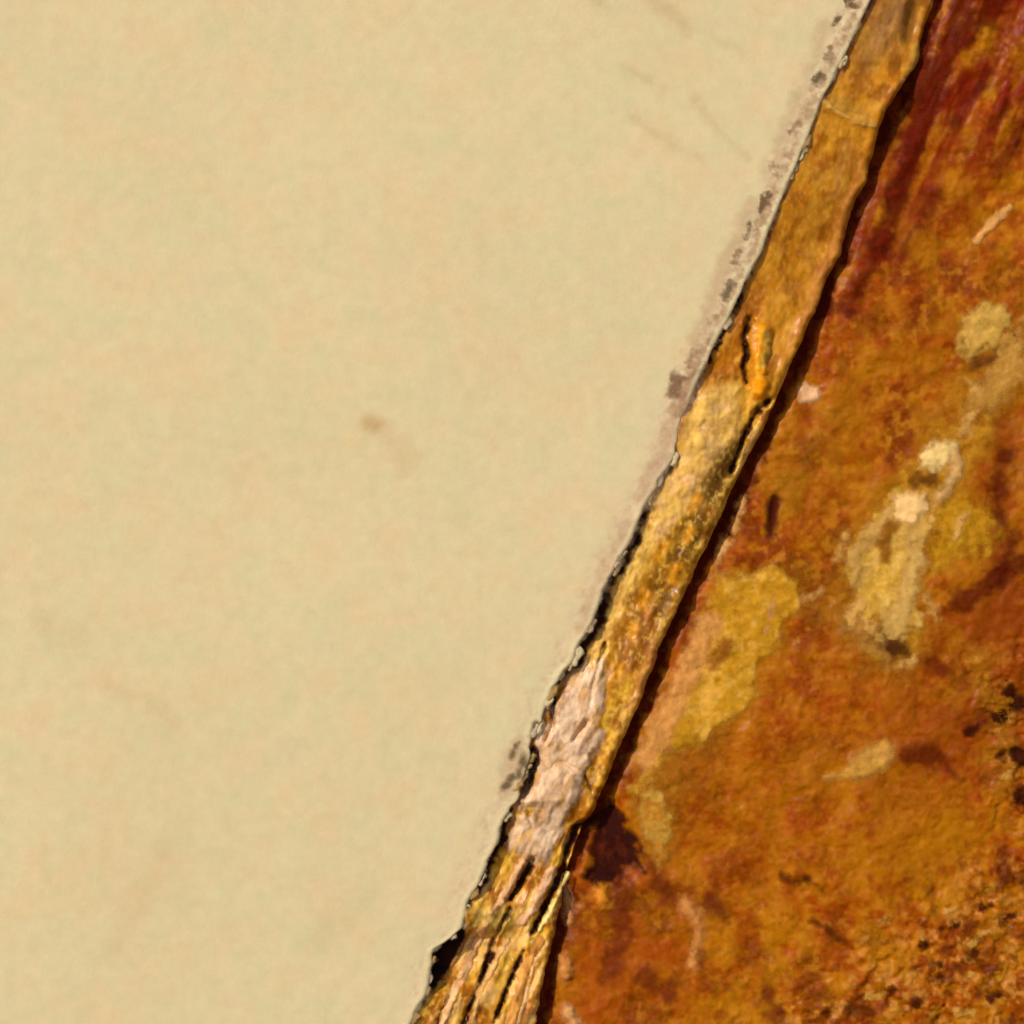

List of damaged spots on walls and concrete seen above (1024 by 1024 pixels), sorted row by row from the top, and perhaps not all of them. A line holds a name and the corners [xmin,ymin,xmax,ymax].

corrosion [841,0,1005,317]
crack [411,0,942,1024]
flaking render [412,0,1024,1024]
corrosion [952,477,1024,611]
corrosion [966,860,1022,978]
corrosion [865,962,942,1012]
corrosion [931,1008,976,1019]
corrosion [986,966,1007,1009]